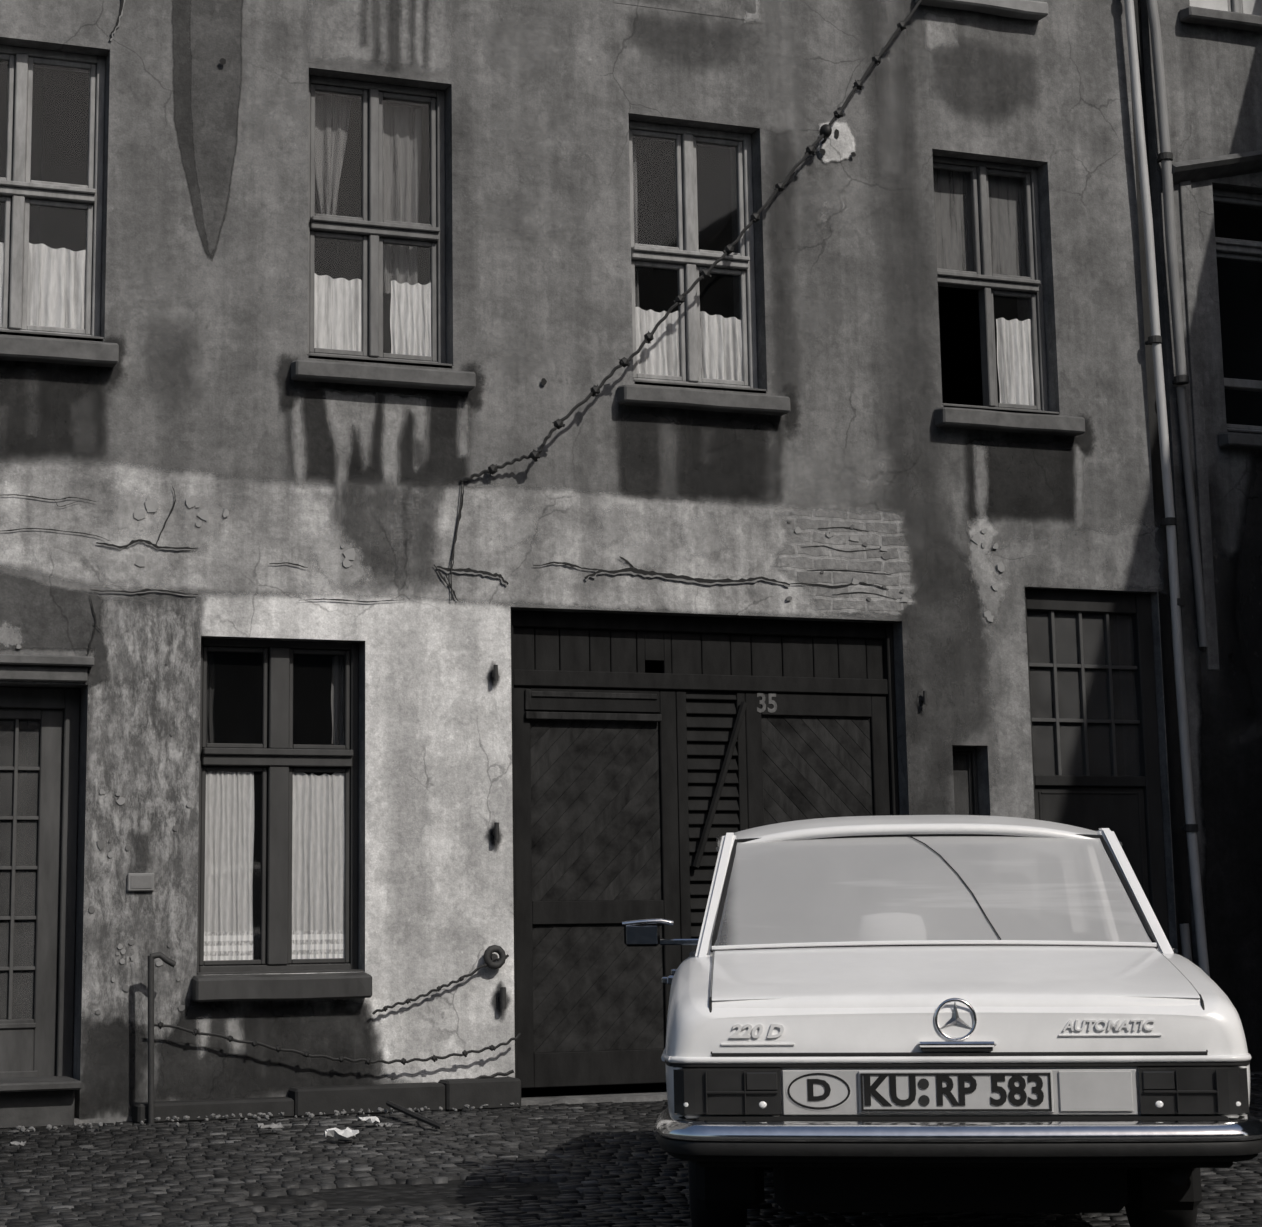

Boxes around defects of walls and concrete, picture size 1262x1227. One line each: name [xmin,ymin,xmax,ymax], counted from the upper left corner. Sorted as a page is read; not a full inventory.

crack [109,0,125,41]
damp [172,0,243,259]
crack [2,486,198,551]
damp [289,383,469,583]
crack [434,485,509,601]
damp [618,408,782,500]
crack [533,557,889,590]
flaking render [776,509,915,615]
flaking render [969,516,1009,632]
damp [967,435,1085,528]
flaking render [0,622,22,649]
damp [1182,454,1262,1072]